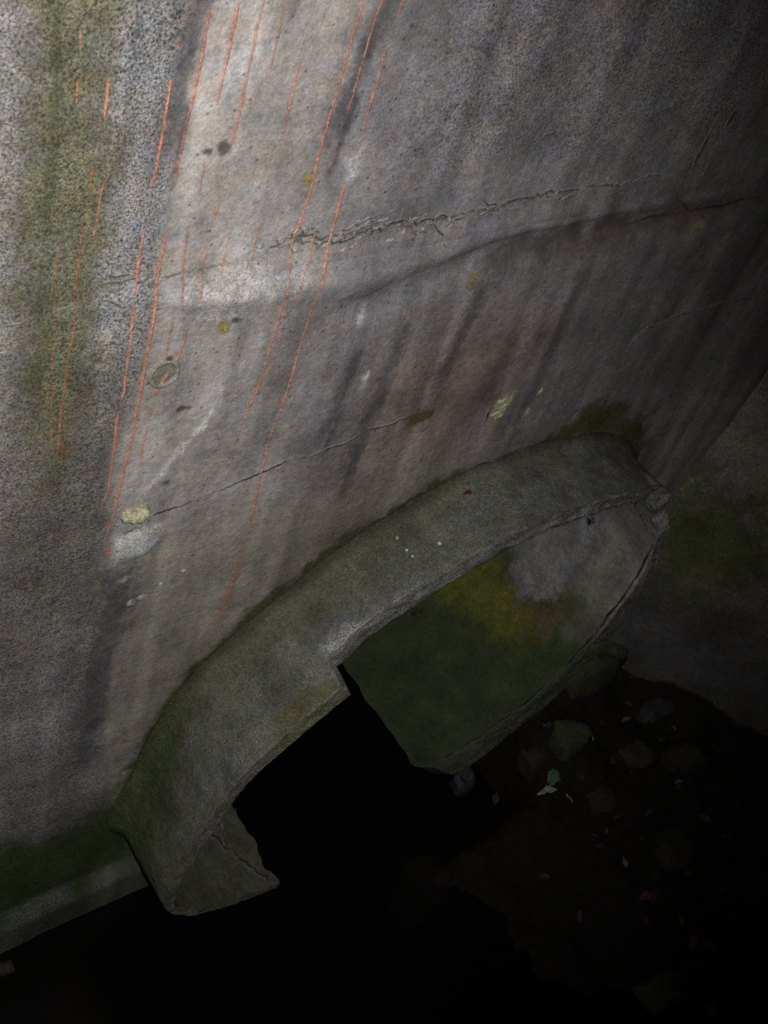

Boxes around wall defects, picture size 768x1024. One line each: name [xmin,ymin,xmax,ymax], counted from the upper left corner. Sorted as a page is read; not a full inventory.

rust [153,82,172,181]
rust [175,8,211,174]
rust [218,6,238,99]
rust [346,0,383,118]
rust [241,2,364,428]
crack [0,108,768,354]
rust [103,232,167,532]
rust [249,182,346,528]
leakage [336,353,370,400]
crack [108,417,406,540]